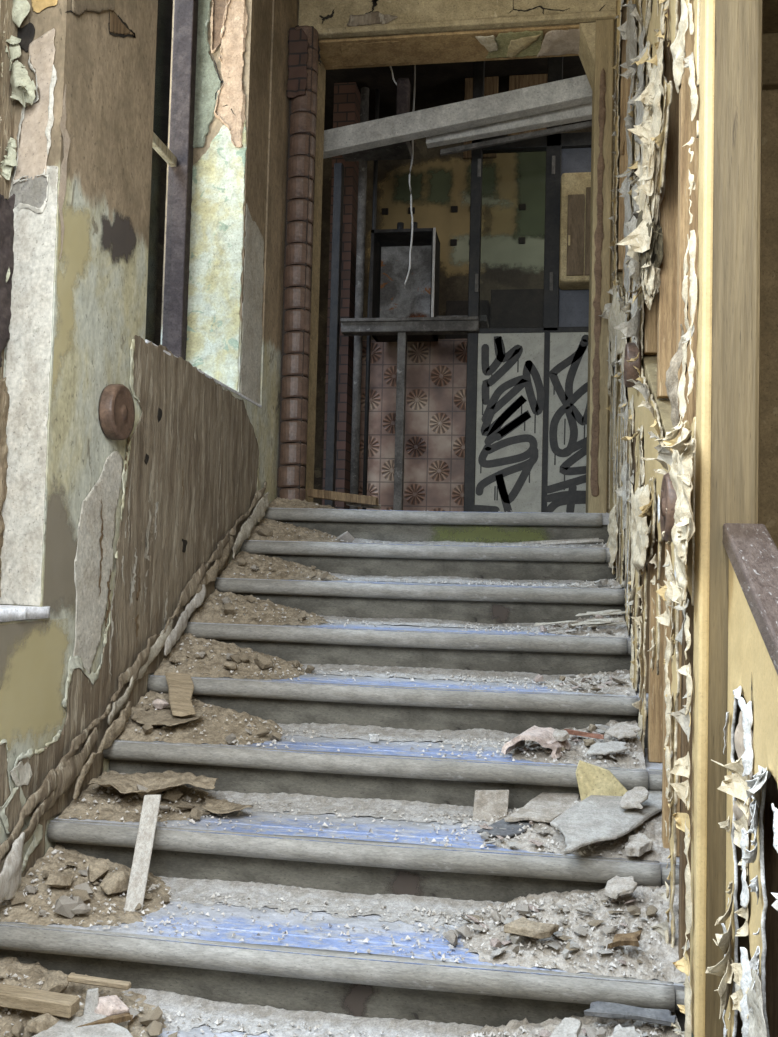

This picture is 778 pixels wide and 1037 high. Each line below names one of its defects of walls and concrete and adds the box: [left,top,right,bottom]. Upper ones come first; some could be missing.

peeling [193,0,248,148]
crack [508,6,570,14]
flaking render [0,0,58,597]
peeling [0,335,260,877]
peeling [608,491,689,651]
peeling [705,758,778,1020]